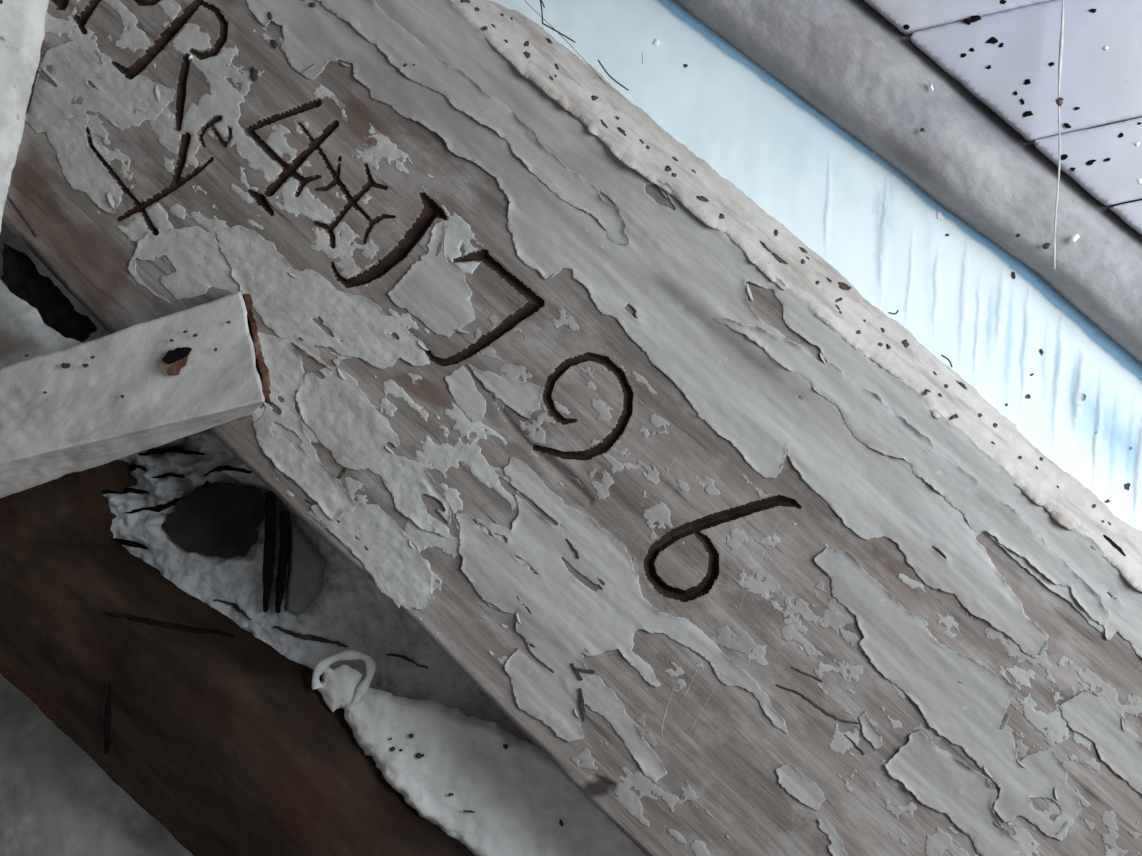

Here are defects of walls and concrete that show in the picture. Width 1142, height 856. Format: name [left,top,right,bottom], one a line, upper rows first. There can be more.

spalling [1,243,97,342]
peeling [25,0,788,856]
peeling [246,0,1142,856]